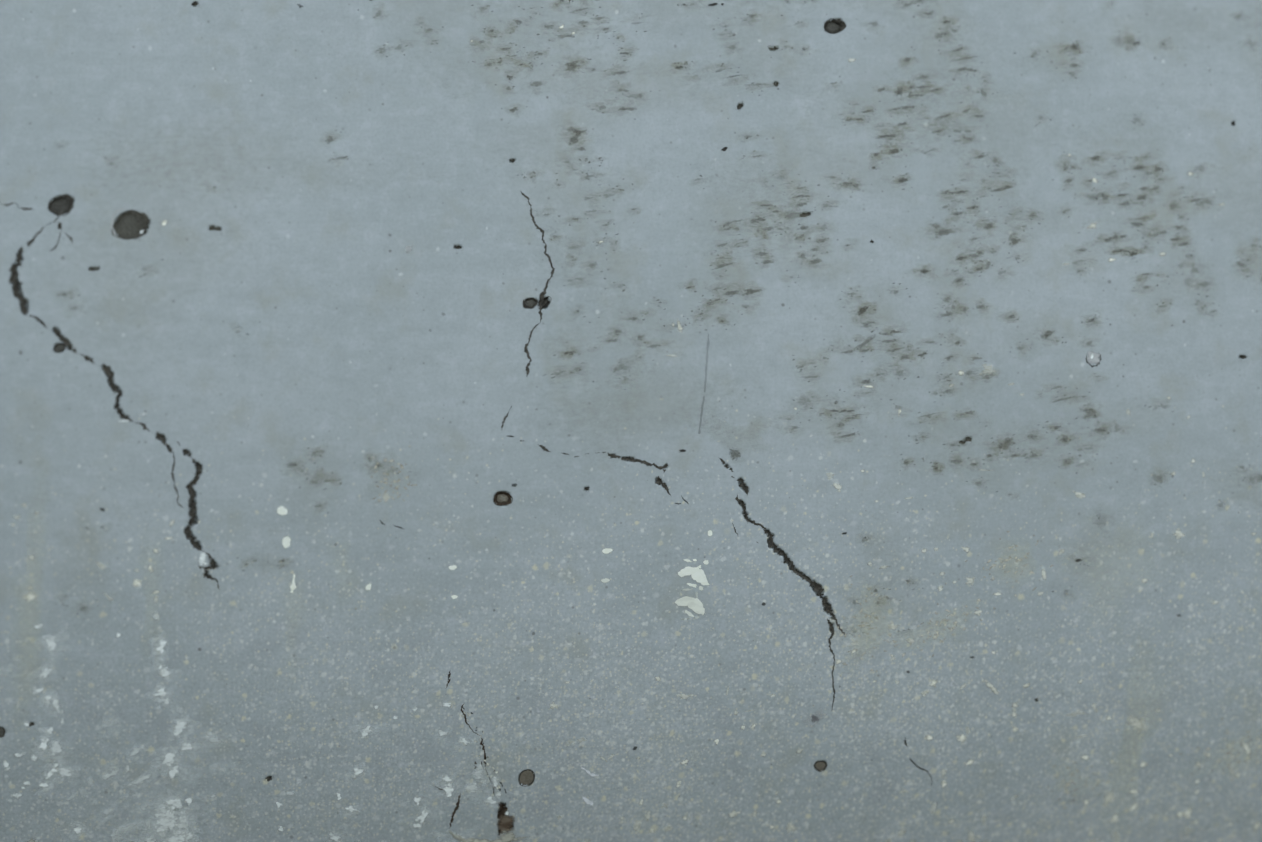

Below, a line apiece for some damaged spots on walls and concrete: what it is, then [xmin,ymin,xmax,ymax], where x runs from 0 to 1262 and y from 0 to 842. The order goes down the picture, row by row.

crack [521,192,556,375]
crack [0,202,220,591]
crack [501,406,688,504]
crack [718,457,845,710]
crack [435,671,511,827]